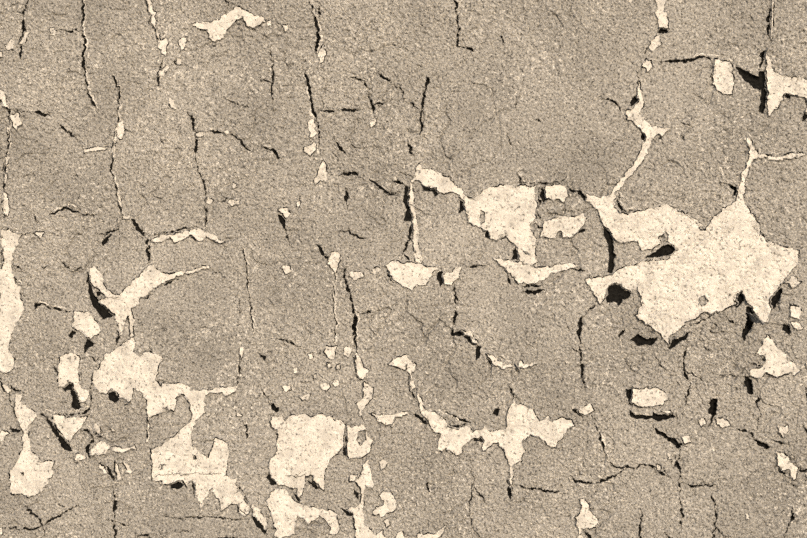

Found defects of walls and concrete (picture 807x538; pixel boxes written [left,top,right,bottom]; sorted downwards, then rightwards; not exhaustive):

peeling [145,0,188,86]
peeling [192,0,290,47]
crack [99,75,150,263]
crack [187,112,282,232]
crack [301,67,430,208]
peeling [348,0,807,395]
crack [317,245,375,351]
peeling [0,190,600,538]
crack [520,423,687,538]
peeling [626,386,675,421]
crack [708,399,717,427]
peeling [697,415,807,486]